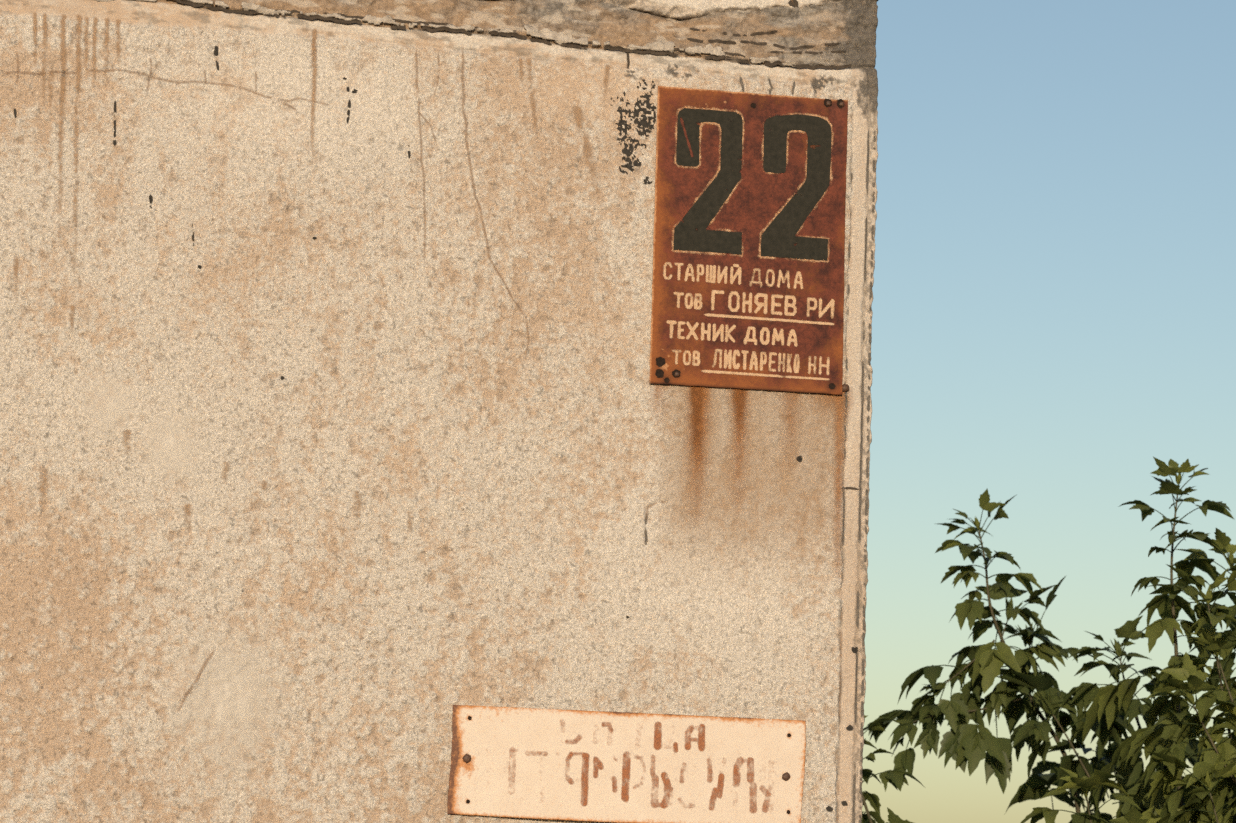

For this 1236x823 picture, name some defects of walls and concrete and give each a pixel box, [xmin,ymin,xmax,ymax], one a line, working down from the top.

peeling [180,0,610,46]
peeling [627,41,725,59]
leakage [33,13,120,172]
corrosion [685,386,714,504]
corrosion [729,389,755,472]